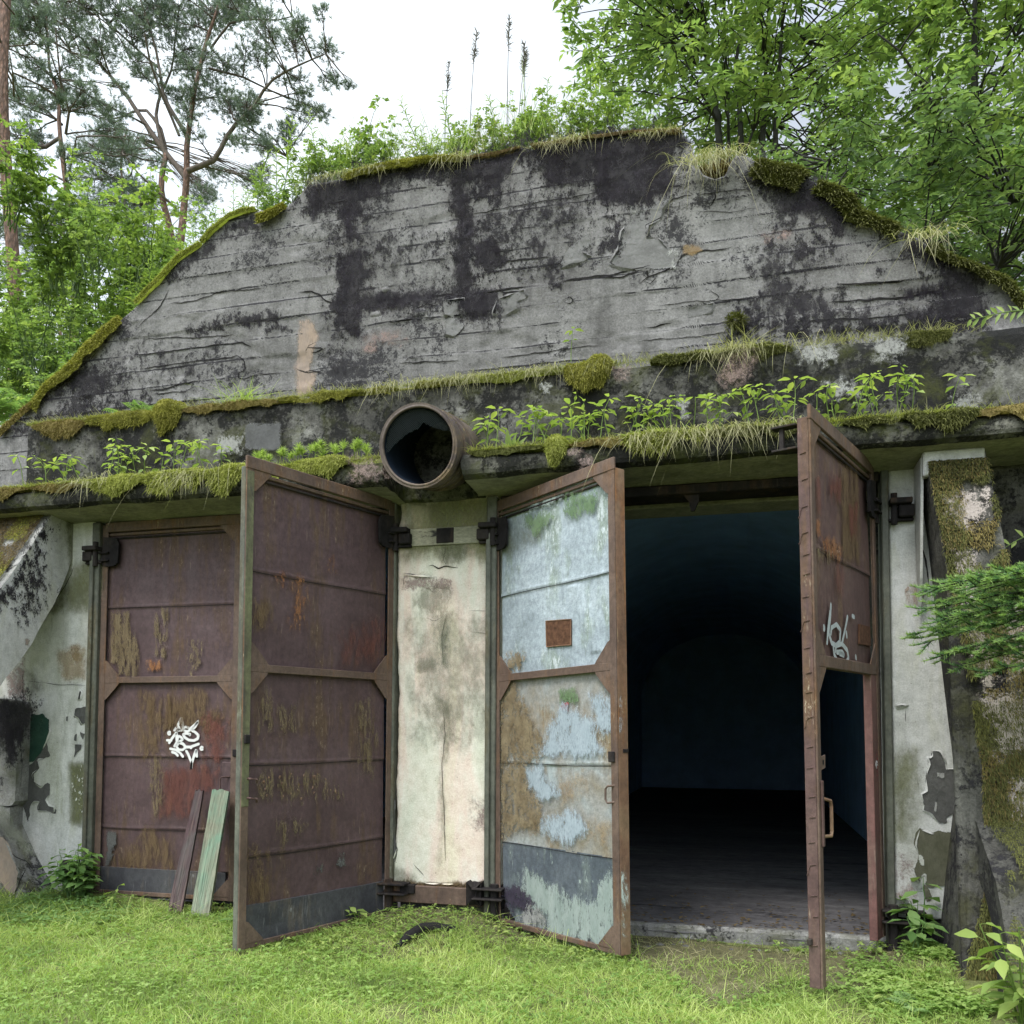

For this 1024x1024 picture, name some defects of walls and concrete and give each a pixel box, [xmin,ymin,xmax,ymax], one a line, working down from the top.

crack [138,288,346,394]
crack [391,287,523,364]
leakage [291,115,710,375]
crack [561,247,748,341]
crack [801,280,931,322]
leakage [405,498,487,529]
leakage [0,518,89,630]
rust [110,607,169,677]
flaking render [23,714,56,820]
rust [167,689,223,732]
rust [500,651,546,846]
flaking render [914,750,954,902]